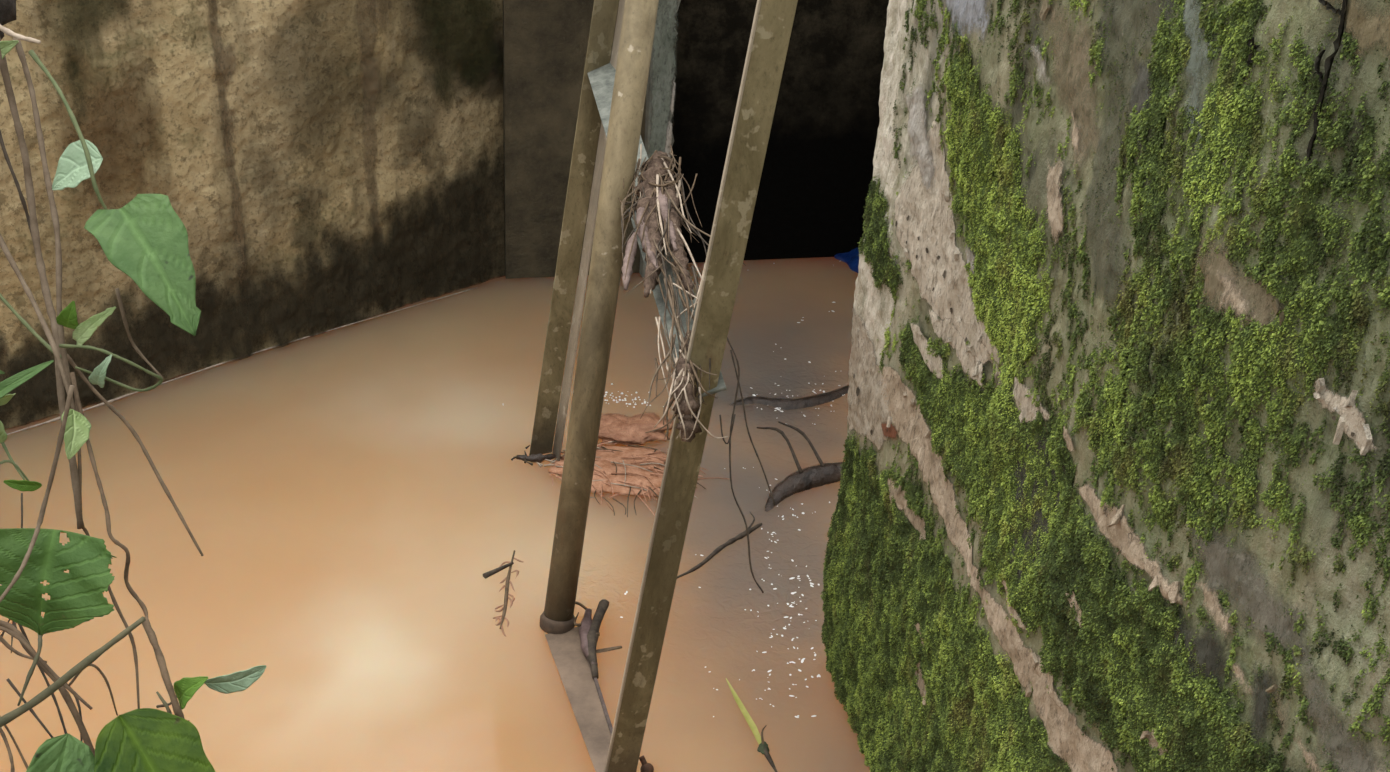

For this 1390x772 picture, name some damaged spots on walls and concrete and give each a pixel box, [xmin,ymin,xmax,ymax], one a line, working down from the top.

crack [1307,0,1348,161]
peeling [1344,0,1390,56]
damp [0,0,505,427]
spalling [895,121,1074,451]
peeling [1196,243,1285,337]
spalling [1314,378,1377,456]
peeling [847,308,1118,772]
peeling [1079,485,1182,604]
peeling [1140,730,1168,758]